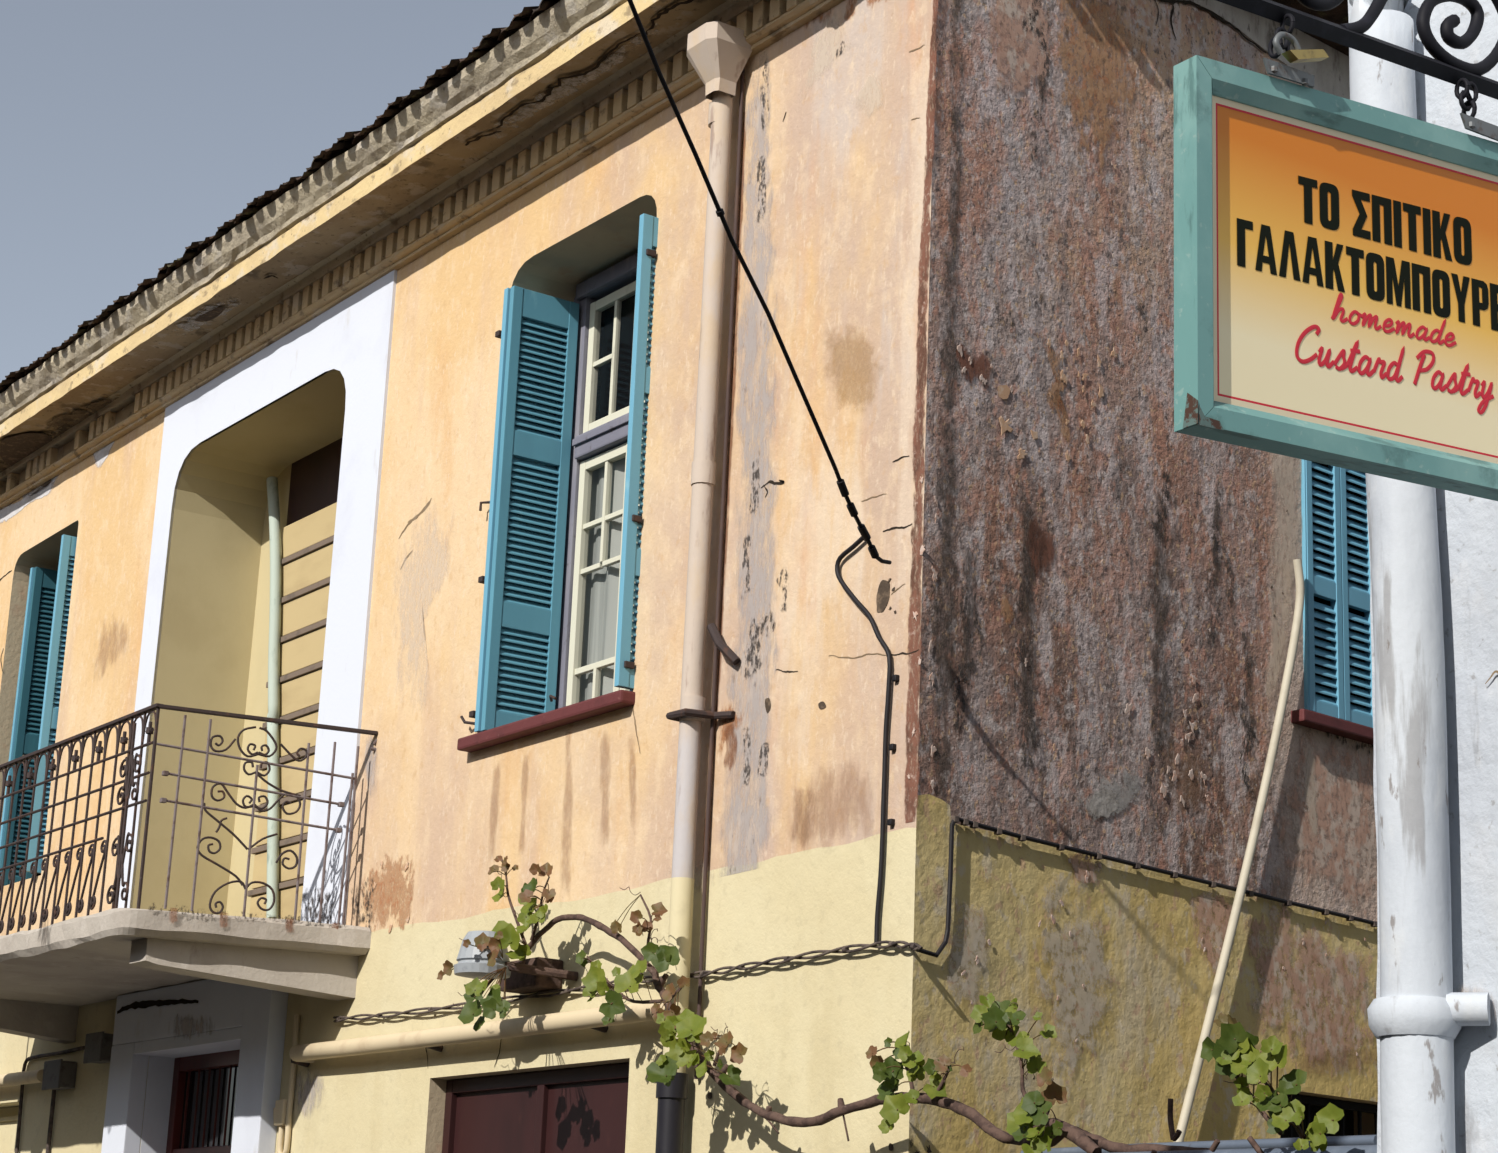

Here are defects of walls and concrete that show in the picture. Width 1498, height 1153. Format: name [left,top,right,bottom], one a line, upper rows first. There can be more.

water stain [1023,1,1052,162]
crack [1155,0,1266,53]
flaking render [0,476,57,522]
crack [399,499,431,570]
water stain [928,101,989,791]
water stain [1012,505,1043,773]
water stain [1143,472,1176,833]
water stain [1205,482,1234,659]
water stain [1238,632,1259,792]
peeling [361,856,413,933]
crack [117,998,199,1014]